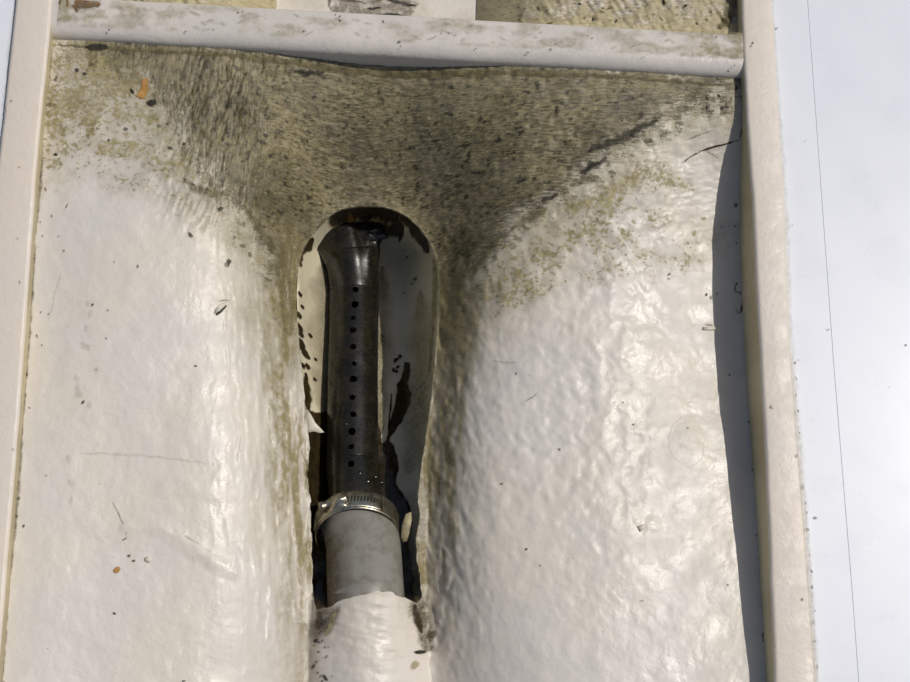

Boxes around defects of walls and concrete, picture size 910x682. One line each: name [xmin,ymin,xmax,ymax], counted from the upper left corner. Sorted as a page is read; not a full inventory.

rust [130,78,156,106]
peeling [300,237,314,267]
leakage [37,38,742,486]
peeling [297,291,327,444]
peeling [378,354,412,542]